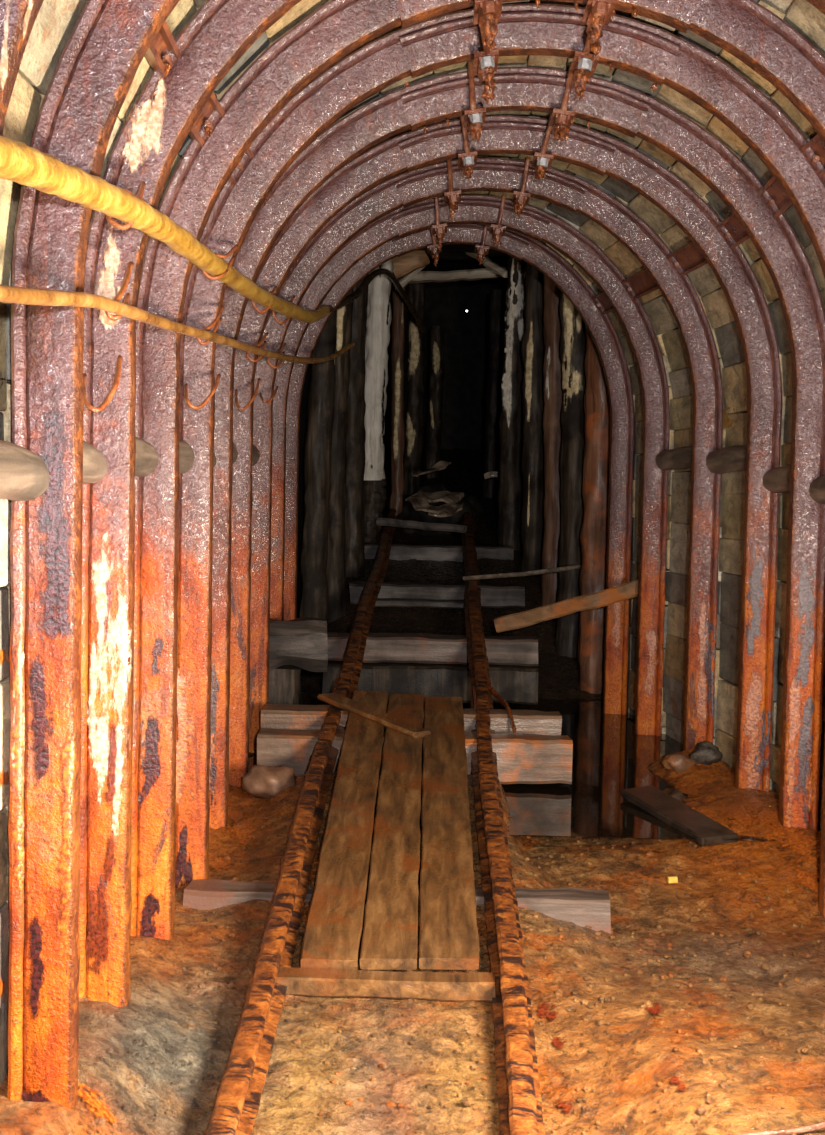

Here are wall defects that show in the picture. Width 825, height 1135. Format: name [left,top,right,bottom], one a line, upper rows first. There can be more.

corrosion [575,10,615,100]
corrosion [0,384,75,937]
corrosion [151,638,164,675]
corrosion [106,723,117,806]
corrosion [138,717,162,809]
corrosion [176,663,196,805]
corrosion [209,662,259,846]
corrosion [175,825,193,888]
corrosion [86,838,116,975]
corrosion [140,892,160,938]
corrosion [30,918,44,1019]
corrosion [21,1089,49,1102]